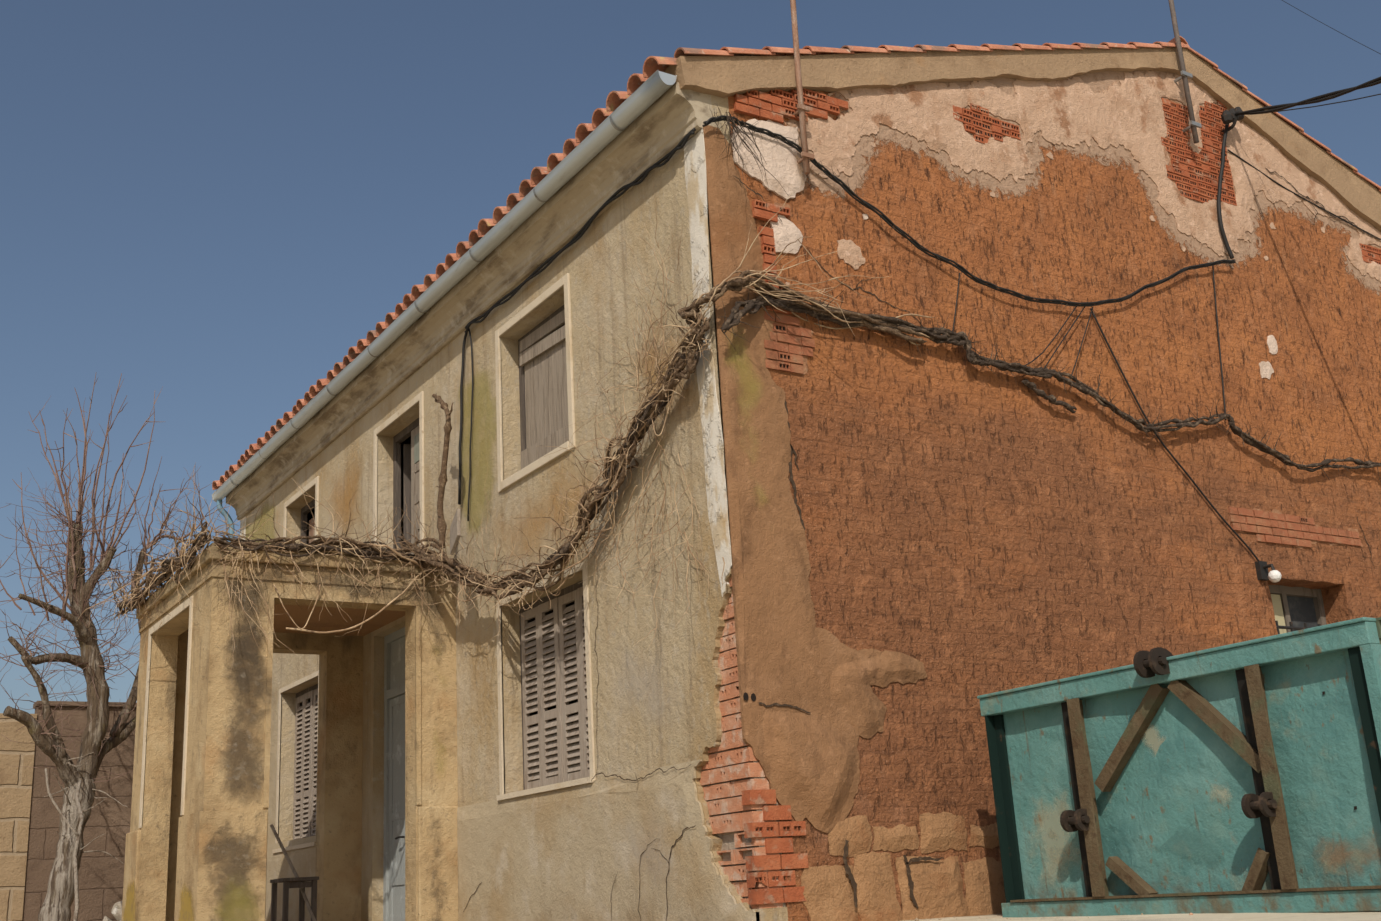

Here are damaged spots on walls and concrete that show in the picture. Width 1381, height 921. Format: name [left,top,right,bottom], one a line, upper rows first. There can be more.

peeling [731,71,1381,380]
flaking render [1228,507,1363,549]
leakage [226,582,265,793]
crack [591,568,691,794]
spalling [700,577,809,909]
leakage [208,838,258,921]
crack [610,825,696,921]